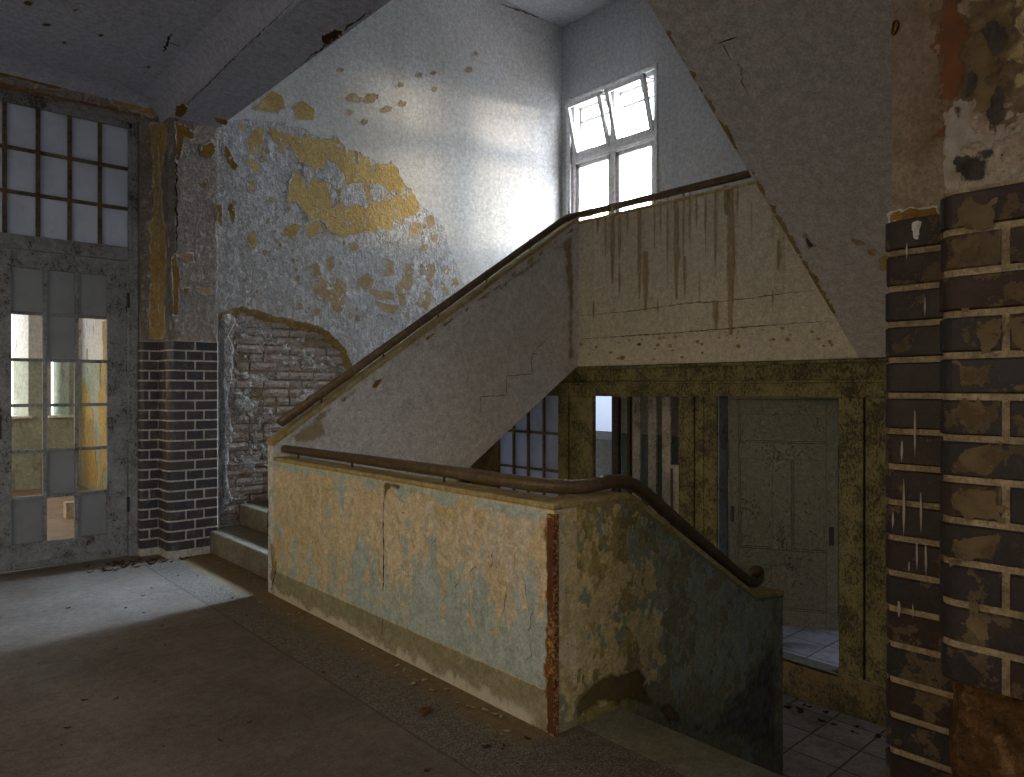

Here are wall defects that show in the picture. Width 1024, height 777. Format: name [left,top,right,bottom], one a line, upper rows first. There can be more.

peeling [345,70,438,125]
crack [719,37,748,95]
spalling [929,0,1024,190]
crack [172,118,180,254]
leakage [597,186,738,334]
spalling [886,205,940,239]
peeling [109,91,668,723]
crack [379,502,387,590]
rust [544,515,553,615]
rust [543,628,553,734]